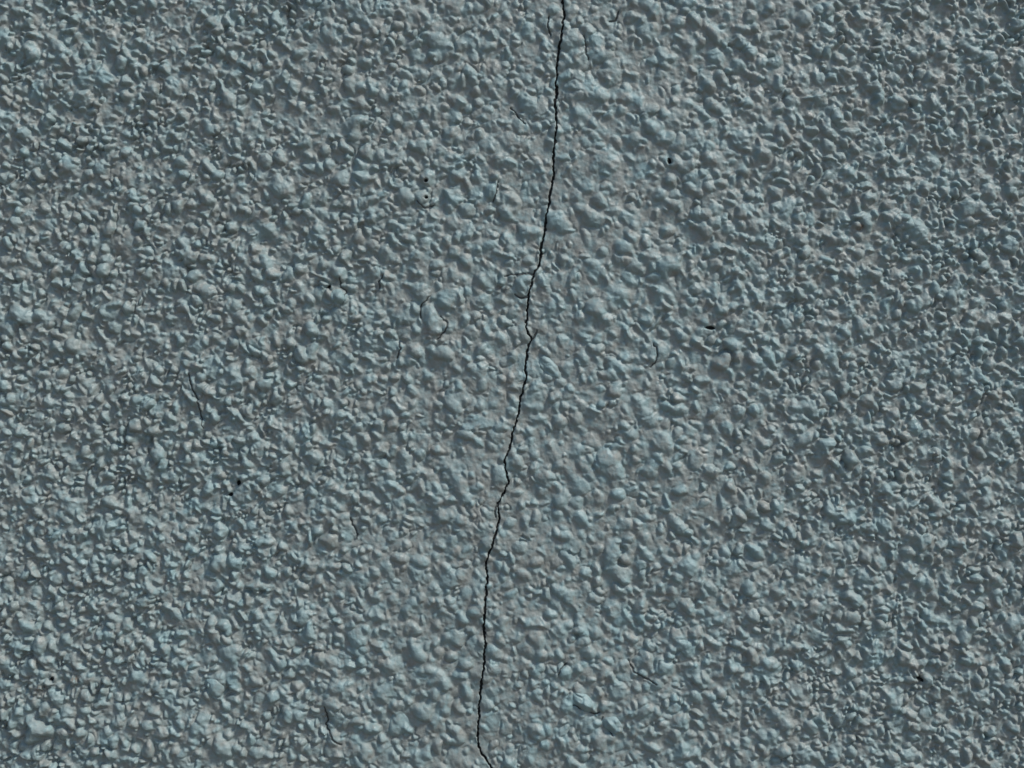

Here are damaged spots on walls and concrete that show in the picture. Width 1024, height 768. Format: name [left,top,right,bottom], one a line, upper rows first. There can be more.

crack [476,0,589,768]